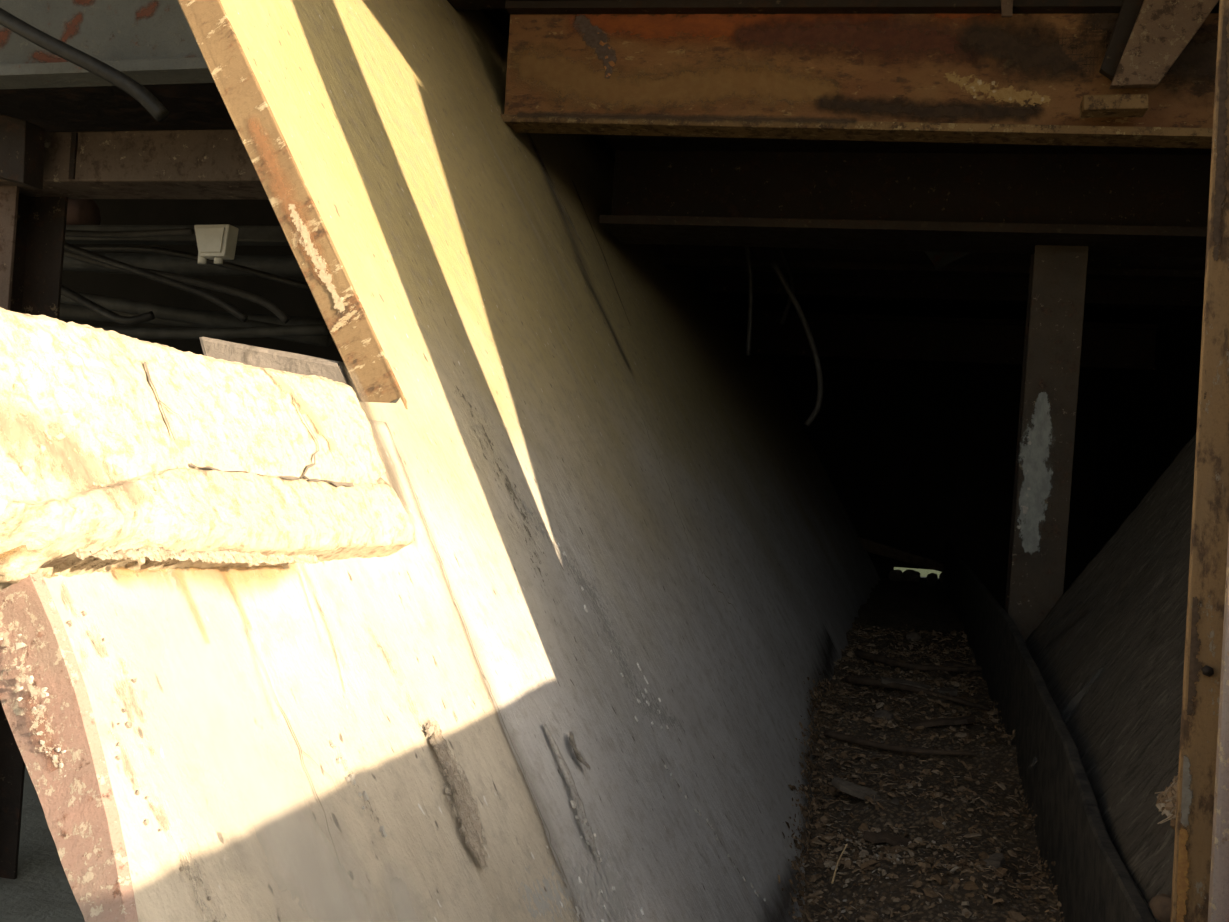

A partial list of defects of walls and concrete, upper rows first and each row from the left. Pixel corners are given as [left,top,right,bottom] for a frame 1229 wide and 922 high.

rust [569,13,997,63]
rust [516,112,857,124]
rust [249,119,328,278]
crack [144,362,354,487]
peeling [1017,392,1053,555]
peeling [0,587,67,777]
spalling [40,547,319,669]
rust [1187,597,1202,716]
peeling [115,742,170,832]
spalling [408,694,487,868]